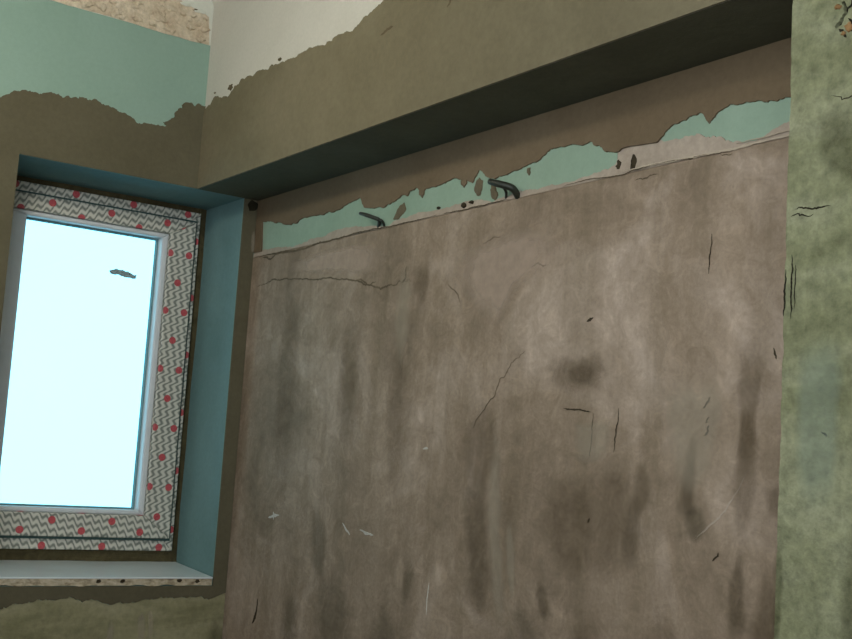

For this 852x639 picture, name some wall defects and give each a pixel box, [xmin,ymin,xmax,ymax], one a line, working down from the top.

spalling [53,0,211,45]
peeling [661,97,791,143]
peeling [263,142,618,250]
crack [565,151,731,186]
crack [259,199,508,290]
crack [783,258,796,319]
crack [473,352,524,428]